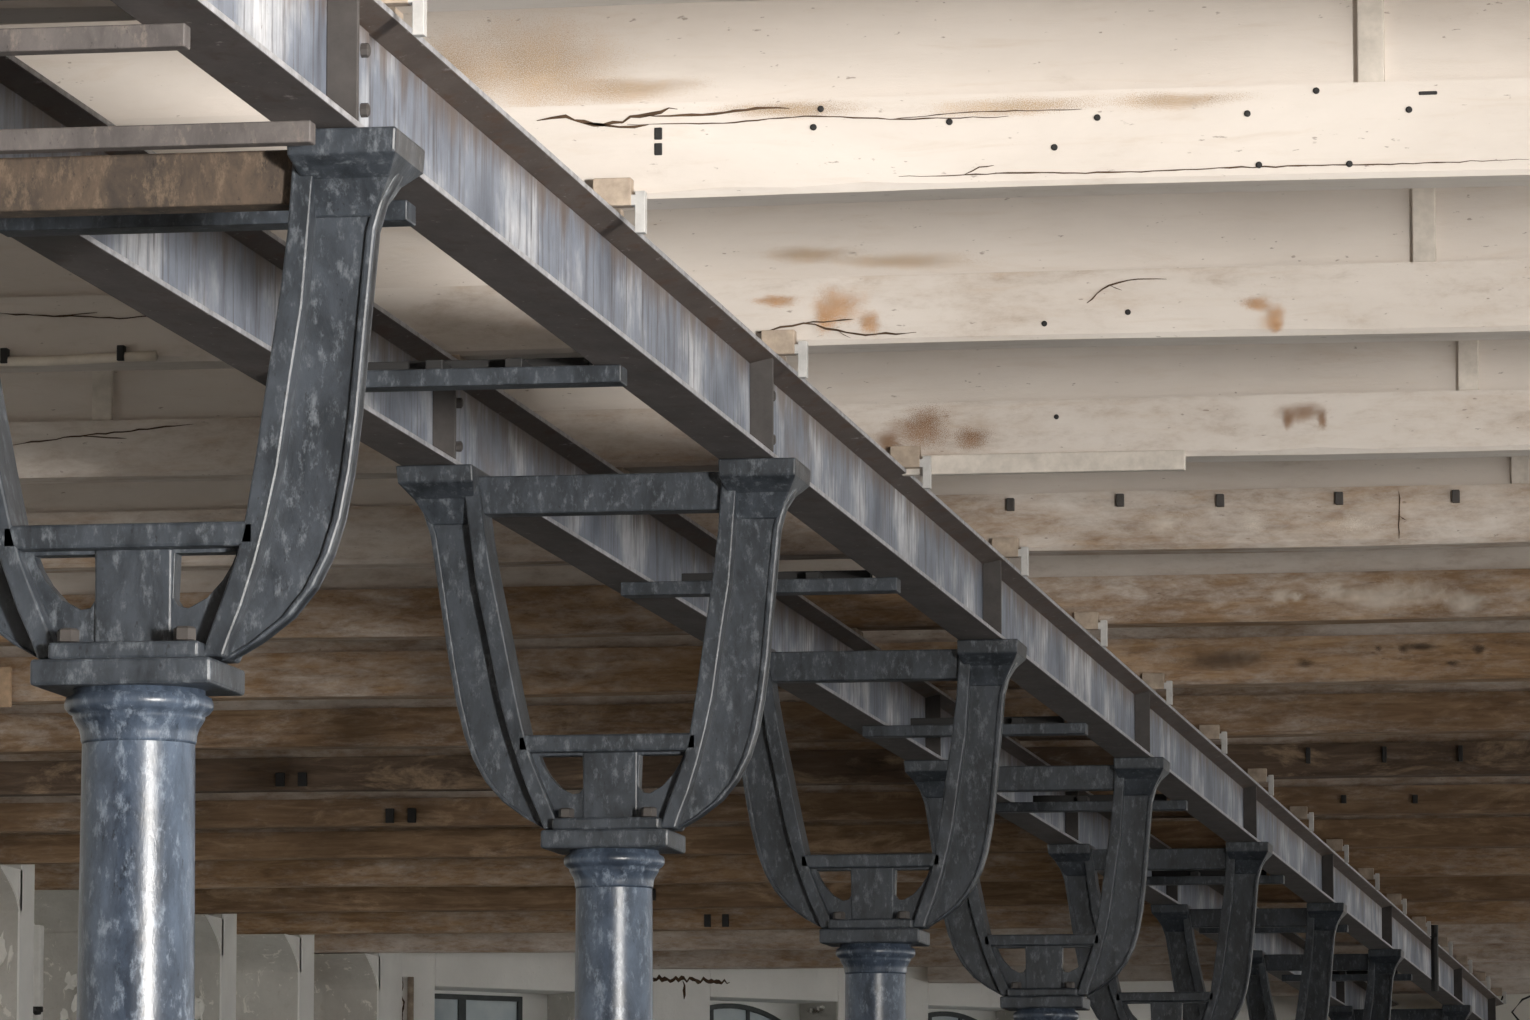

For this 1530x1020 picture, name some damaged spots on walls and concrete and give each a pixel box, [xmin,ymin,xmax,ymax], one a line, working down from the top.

crack [537,107,1079,128]
crack [899,159,1529,177]
rust [747,284,883,336]
rust [1237,294,1288,334]
crack [758,319,916,338]